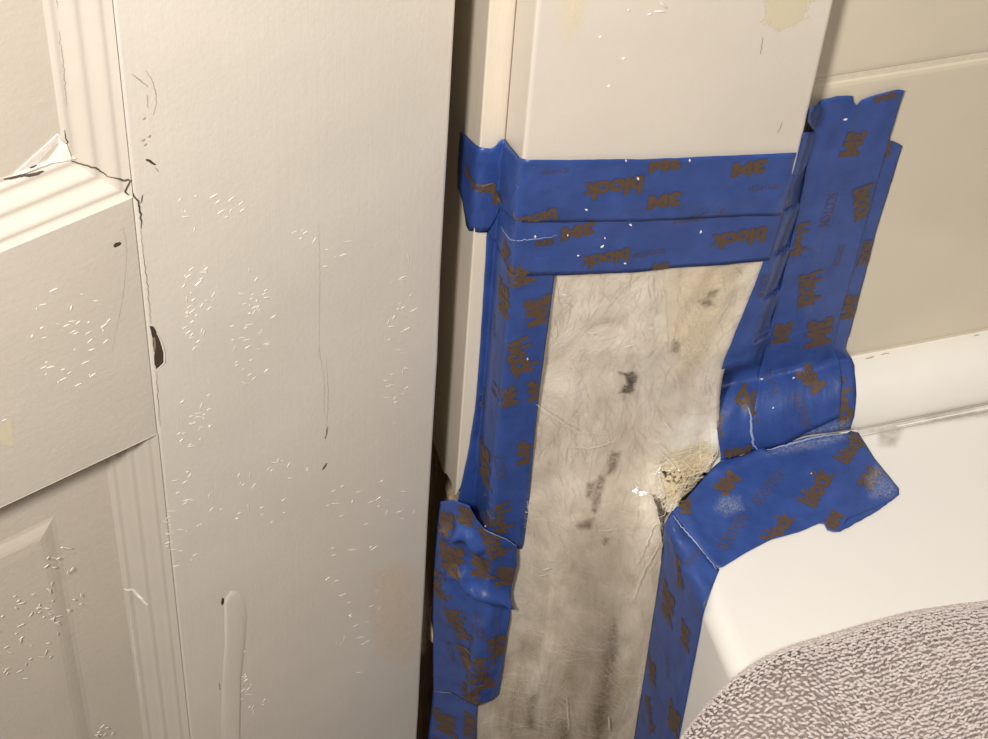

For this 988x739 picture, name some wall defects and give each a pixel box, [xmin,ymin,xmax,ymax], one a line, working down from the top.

crack [59,32,67,106]
crack [64,130,151,350]
peeling [150,326,166,370]